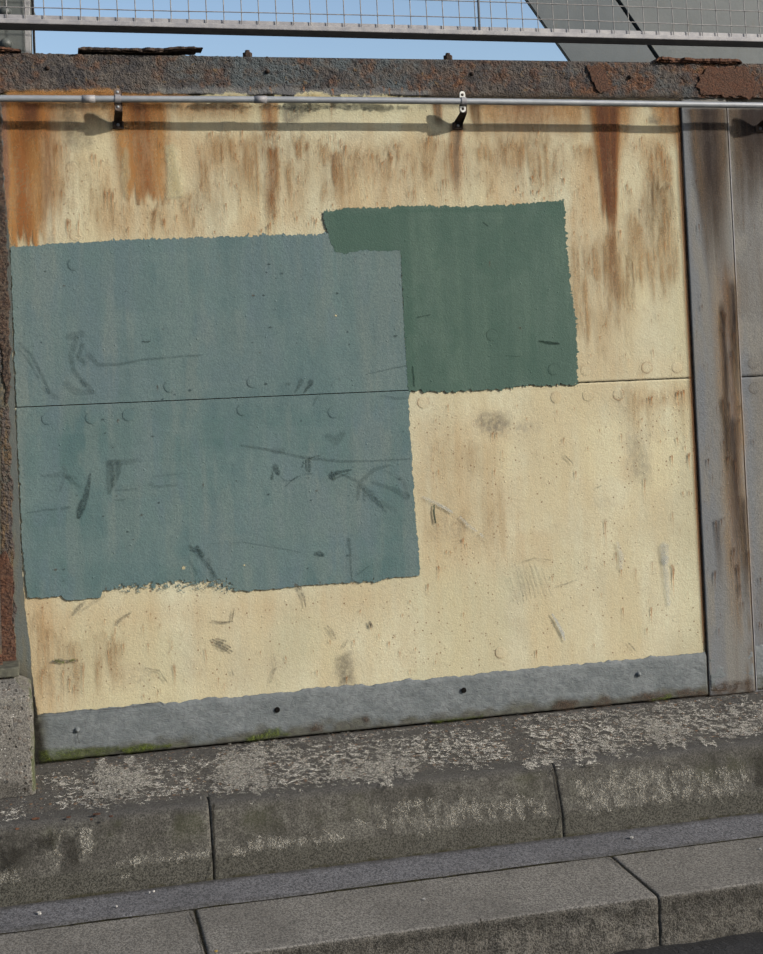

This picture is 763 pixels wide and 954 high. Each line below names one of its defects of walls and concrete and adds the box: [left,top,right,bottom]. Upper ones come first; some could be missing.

rust [78,46,203,56]
rust [651,56,742,64]
rust [1,88,177,247]
rust [201,103,291,232]
rust [321,145,350,188]
rust [434,91,684,338]
damp [575,766,749,814]
damp [374,793,548,836]
damp [80,828,95,856]
damp [232,817,366,857]